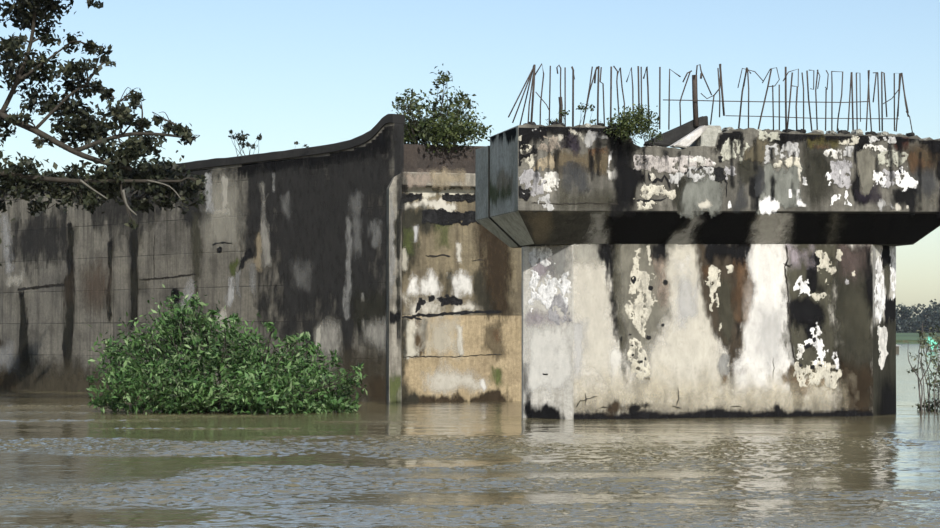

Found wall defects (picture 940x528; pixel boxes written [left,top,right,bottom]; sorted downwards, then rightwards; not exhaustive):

peeling [508,63,918,211]
damp [62,300,74,368]
damp [65,222,74,284]
damp [253,219,271,269]
damp [303,186,512,365]
damp [428,371,486,392]
peeling [528,245,572,326]
peeling [621,245,668,381]
damp [490,127,832,415]
peeling [705,264,734,312]
peeling [793,322,842,391]
peeling [793,249,843,303]